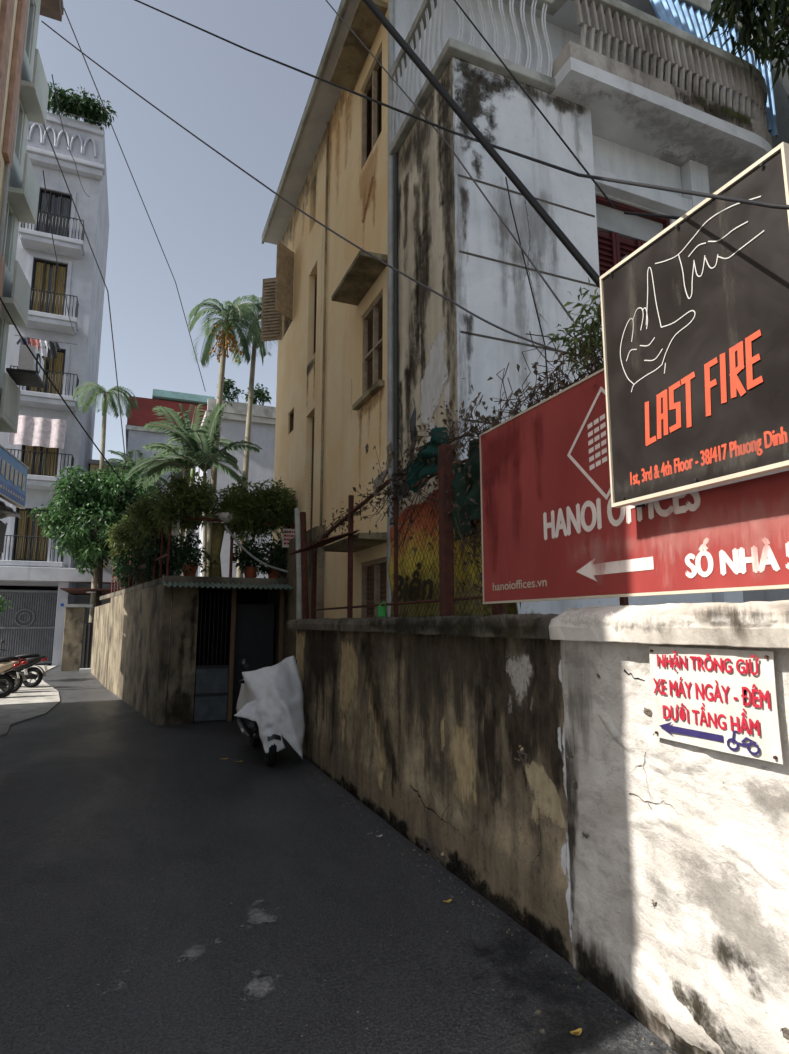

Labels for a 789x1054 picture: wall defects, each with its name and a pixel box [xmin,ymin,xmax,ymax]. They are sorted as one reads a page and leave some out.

water stain [461,188,469,238]
water stain [398,94,443,452]
water stain [392,633,496,795]
crack [410,785,463,837]
water stain [552,741,560,795]
crack [629,734,686,817]
water stain [303,753,694,1054]